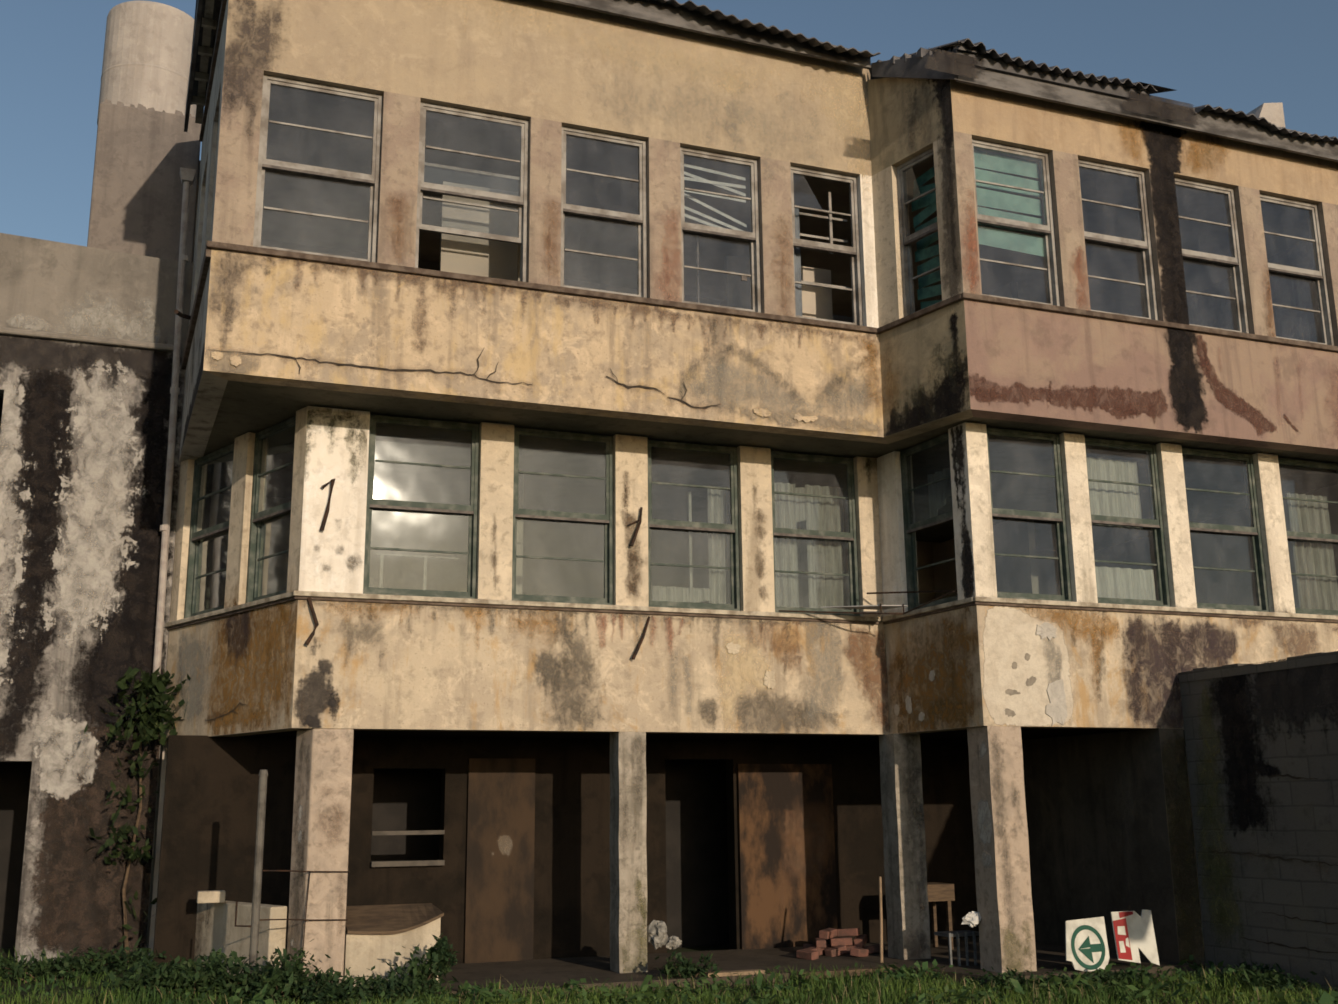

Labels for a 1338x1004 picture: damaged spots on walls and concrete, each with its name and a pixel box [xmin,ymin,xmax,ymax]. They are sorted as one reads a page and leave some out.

leakage [224,0,281,135]
leakage [924,48,985,296]
crack [208,348,532,385]
crack [606,369,733,409]
leakage [884,91,1298,598]
leakage [0,299,210,961]
rust [209,599,297,734]
leakage [294,637,339,728]
leakage [537,611,599,728]
rust [846,609,978,733]
peeling [983,606,1074,726]
leakage [1123,610,1338,964]